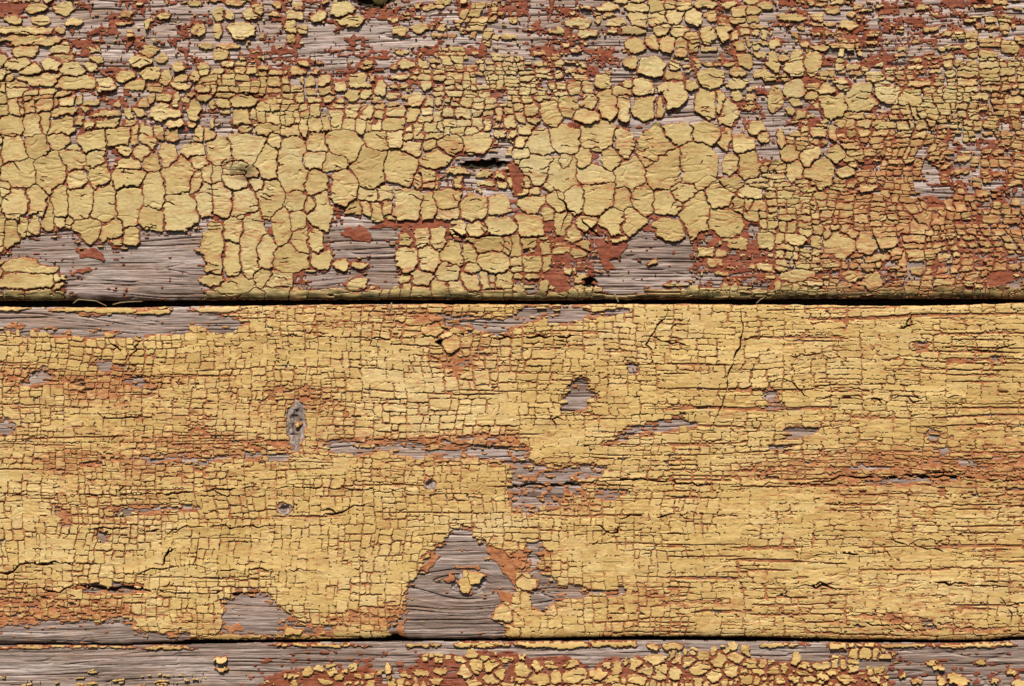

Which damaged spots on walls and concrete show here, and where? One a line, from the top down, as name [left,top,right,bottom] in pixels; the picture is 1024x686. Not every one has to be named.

peeling [0,0,1024,344]
peeling [559,371,600,416]
crack [717,321,761,415]
crack [776,354,920,403]
peeling [602,412,698,447]
crack [86,486,255,497]
crack [280,486,409,516]
peeling [305,427,636,520]
crack [513,470,1023,488]
crack [2,524,299,596]
peeling [0,523,1024,686]
crack [936,580,1023,618]